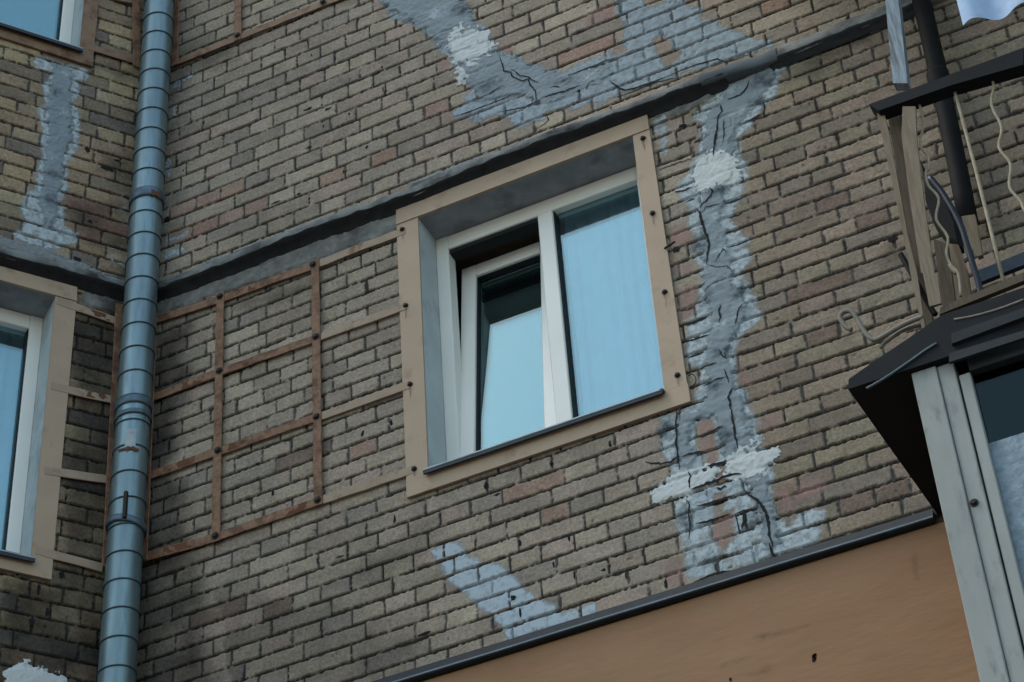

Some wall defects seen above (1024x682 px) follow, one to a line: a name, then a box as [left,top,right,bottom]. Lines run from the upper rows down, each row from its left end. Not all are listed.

crack [452,52,765,170]
crack [645,187,777,557]